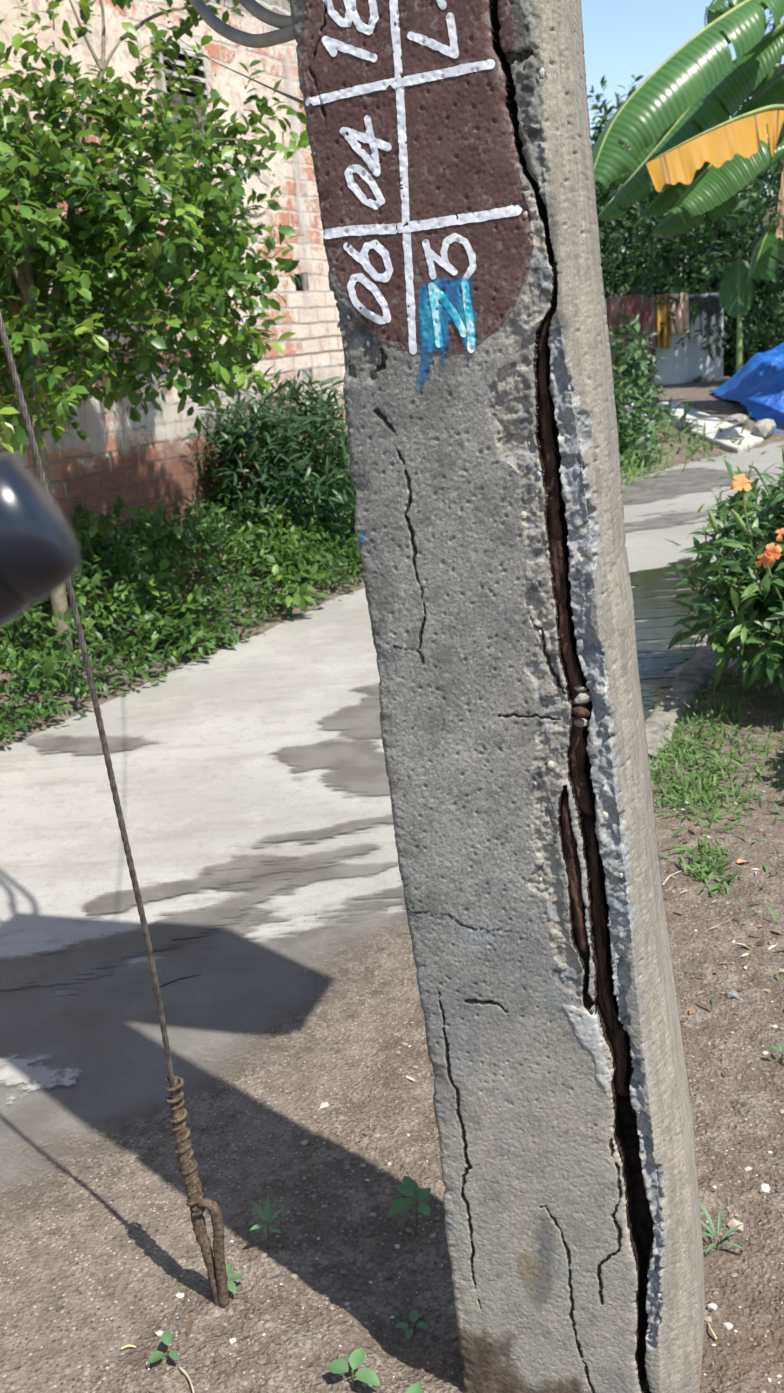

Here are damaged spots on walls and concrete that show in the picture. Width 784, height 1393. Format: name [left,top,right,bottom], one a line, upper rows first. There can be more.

crack [375,348,387,373]
damp [21,733,164,755]
damp [271,682,391,797]
crack [373,409,426,665]
crack [489,0,654,1393]
spalling [486,0,665,1350]
damp [0,812,408,1218]
crack [438,992,507,1309]